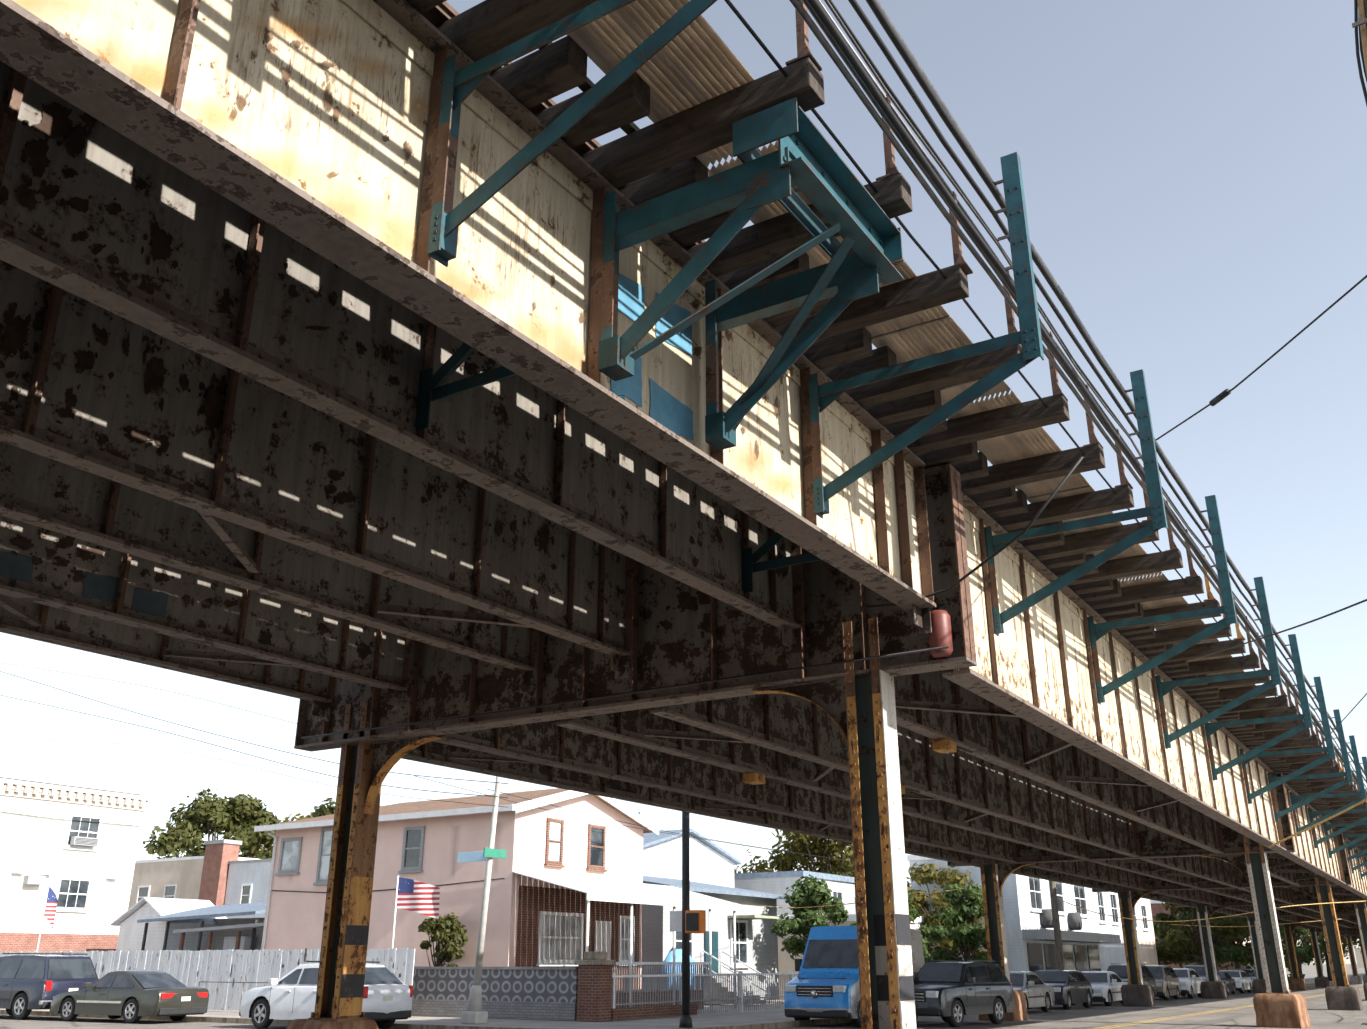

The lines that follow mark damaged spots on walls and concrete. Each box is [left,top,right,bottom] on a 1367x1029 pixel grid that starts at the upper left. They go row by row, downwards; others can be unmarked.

peeling [250,27,273,64]
peeling [228,93,251,119]
peeling [278,62,293,85]
peeling [319,57,342,125]
peeling [382,130,414,164]
peeling [15,165,125,271]
peeling [0,299,48,409]
peeling [63,323,150,409]
peeling [459,342,497,375]
peeling [489,515,554,548]
peeling [9,534,106,583]
peeling [140,568,175,586]